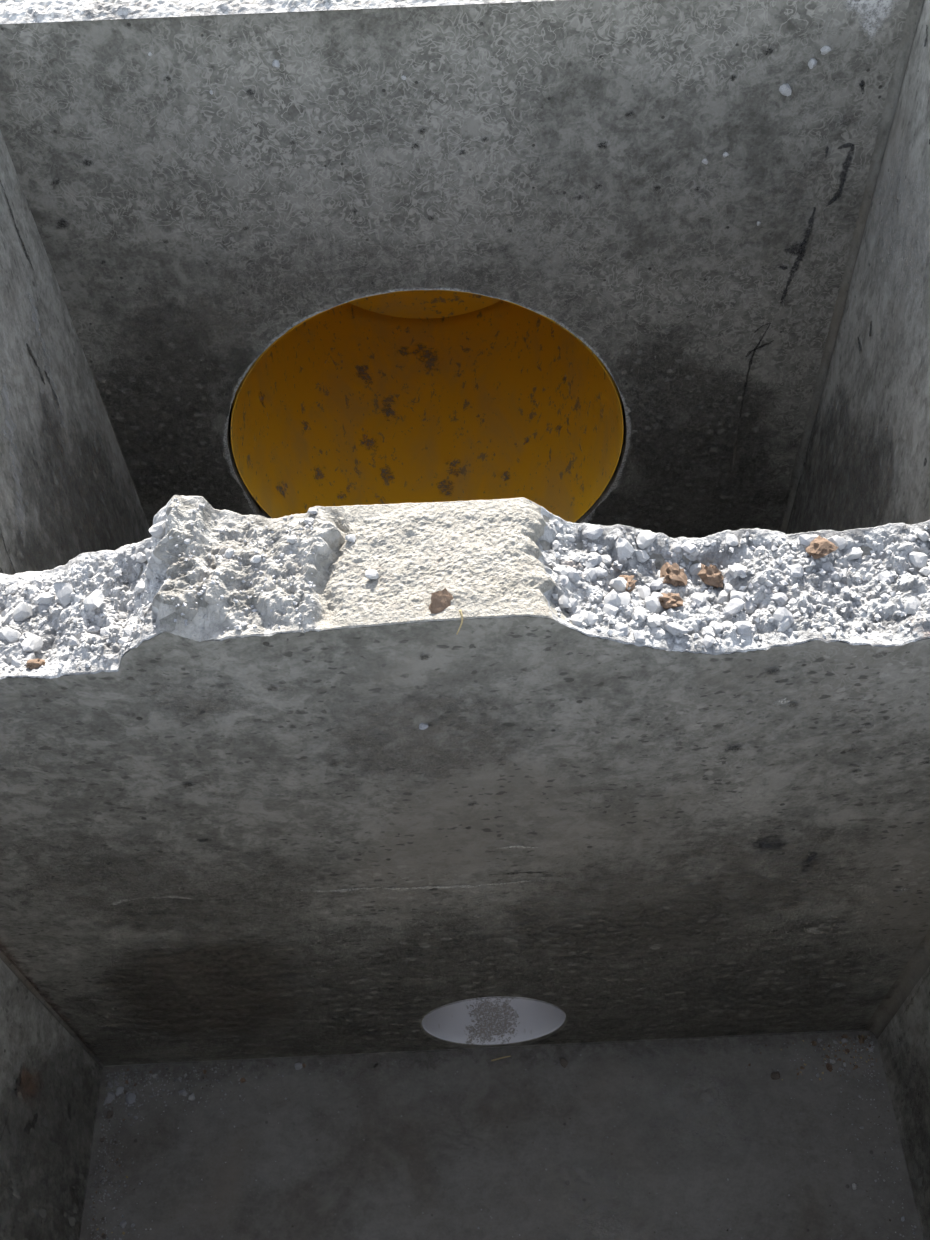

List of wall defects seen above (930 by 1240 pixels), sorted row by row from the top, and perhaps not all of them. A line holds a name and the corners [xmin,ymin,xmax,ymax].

spalling [0,288,930,679]
crack [733,323,774,464]